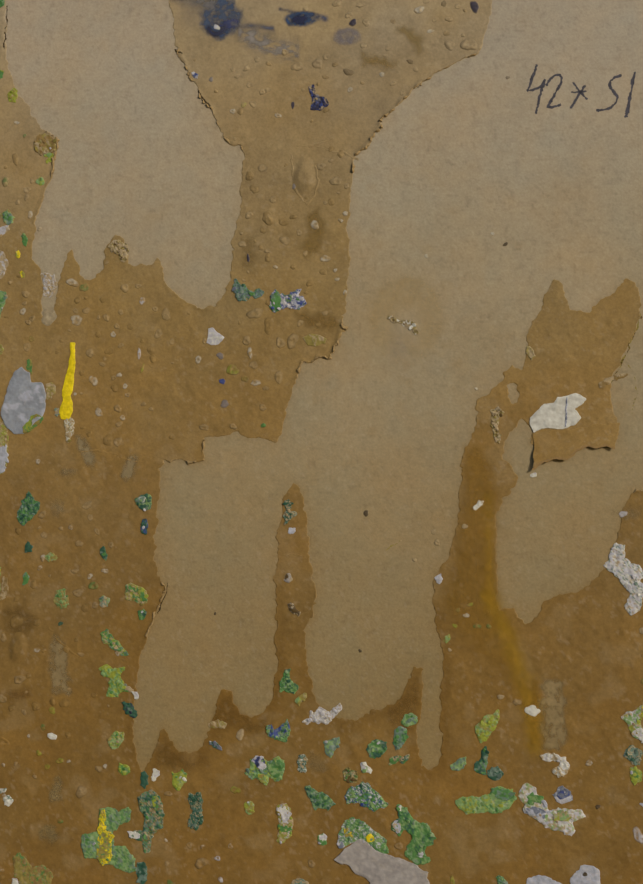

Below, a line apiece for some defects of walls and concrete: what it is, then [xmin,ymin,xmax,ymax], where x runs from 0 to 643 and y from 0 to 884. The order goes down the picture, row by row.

peeling [0,0,307,316]
peeling [98,0,643,789]
peeling [81,807,148,884]
peeling [127,789,165,853]
peeling [172,769,204,831]
peeling [276,803,293,844]
peeling [305,785,336,811]
peeling [342,739,388,812]
peeling [334,804,436,884]
peeling [450,709,586,836]
peeling [526,865,601,884]